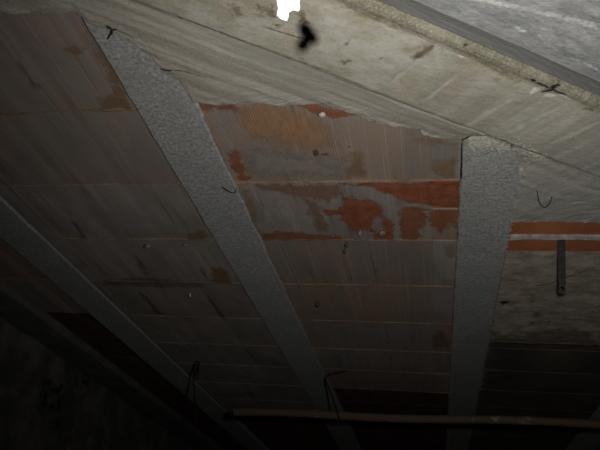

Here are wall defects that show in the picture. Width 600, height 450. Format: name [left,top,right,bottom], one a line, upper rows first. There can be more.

peeling [300,104,354,118]
peeling [258,182,460,241]